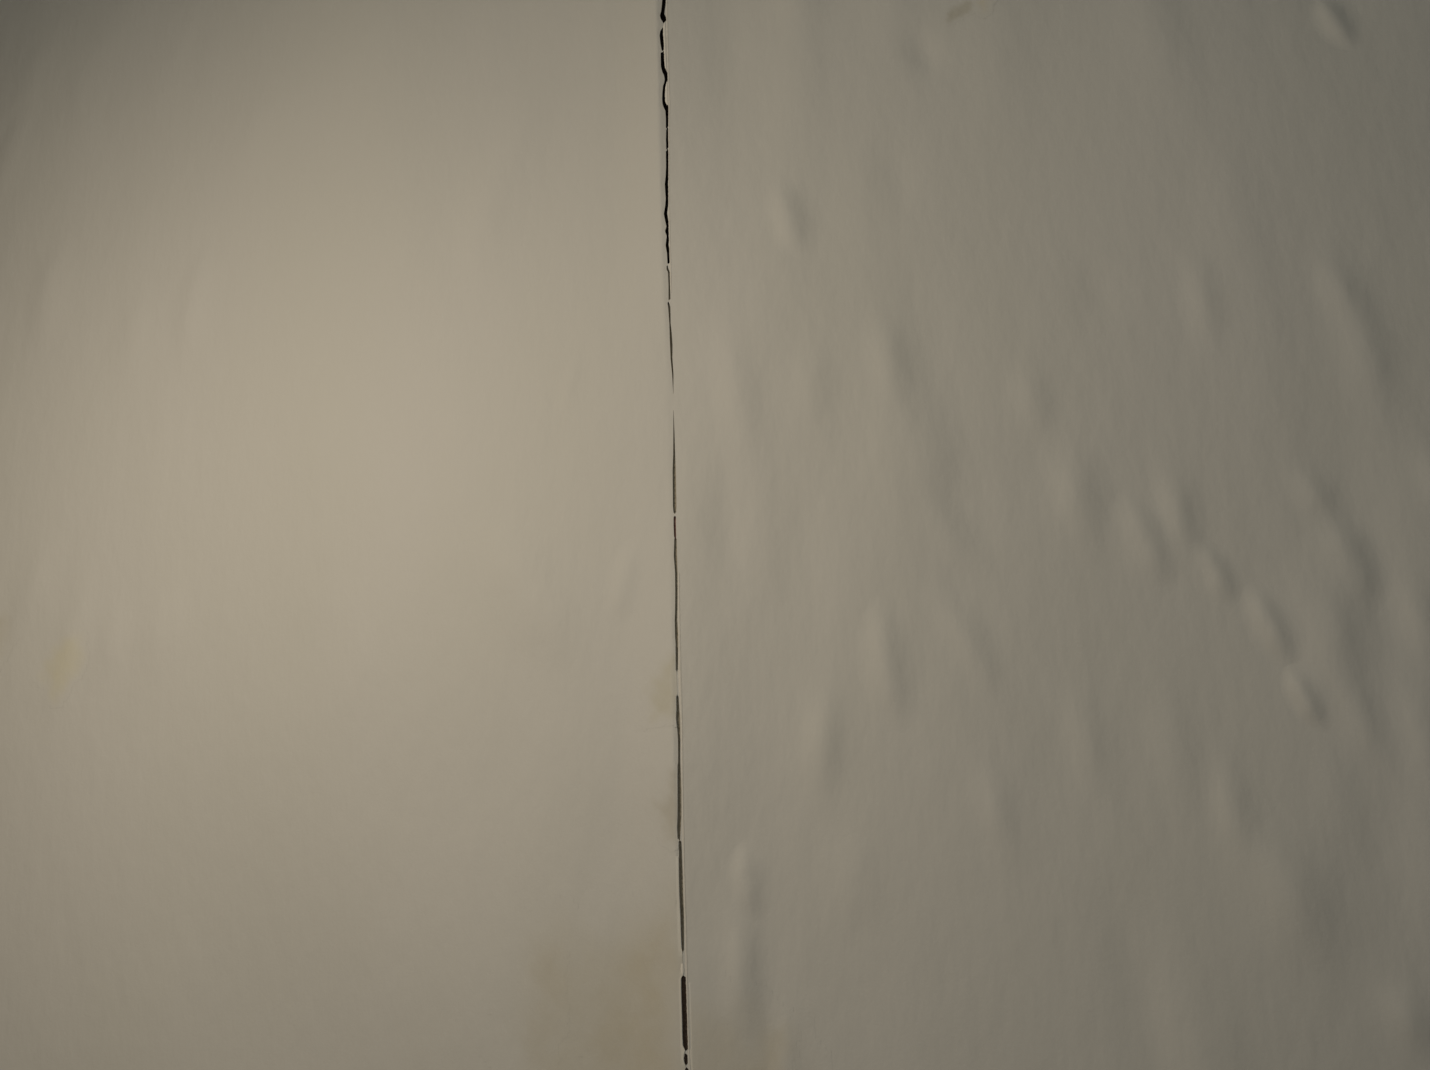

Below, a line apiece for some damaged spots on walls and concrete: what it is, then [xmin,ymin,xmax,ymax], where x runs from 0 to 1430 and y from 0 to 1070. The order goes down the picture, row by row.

crack [660,0,691,1070]